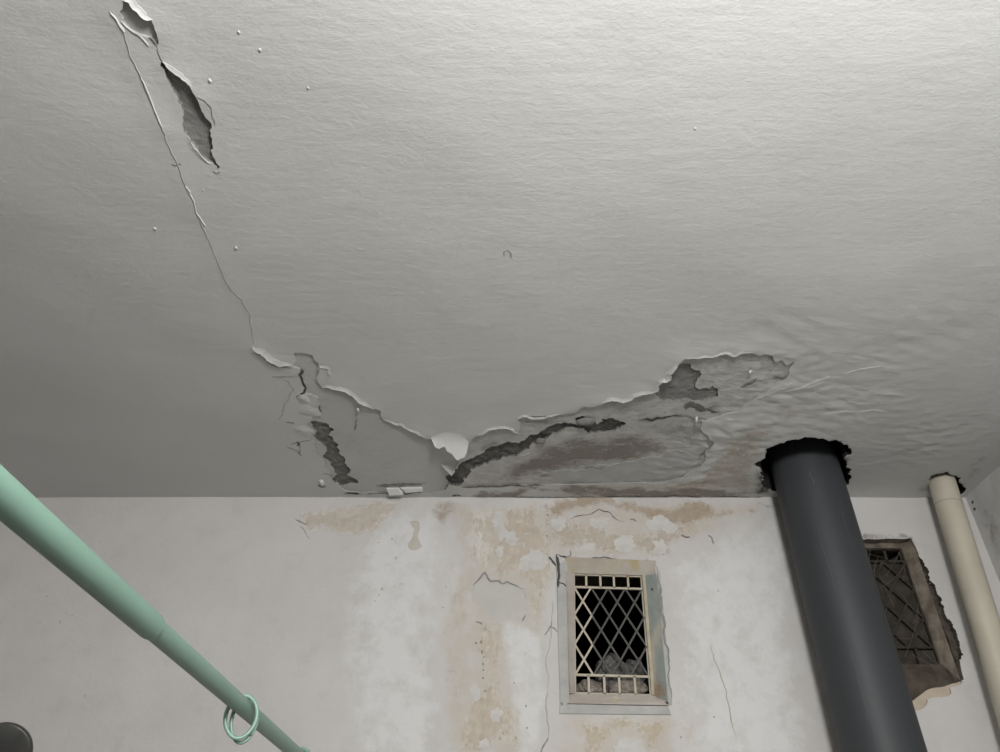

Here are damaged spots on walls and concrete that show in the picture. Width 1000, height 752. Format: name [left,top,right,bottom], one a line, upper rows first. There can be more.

spalling [120,0,219,174]
crack [109,11,254,342]
leakage [476,487,536,498]
peeling [252,346,794,495]
leakage [513,436,660,476]
crack [571,509,636,528]
leakage [551,485,739,550]
crack [540,551,615,752]
spalling [912,681,963,711]
spalling [918,557,963,662]